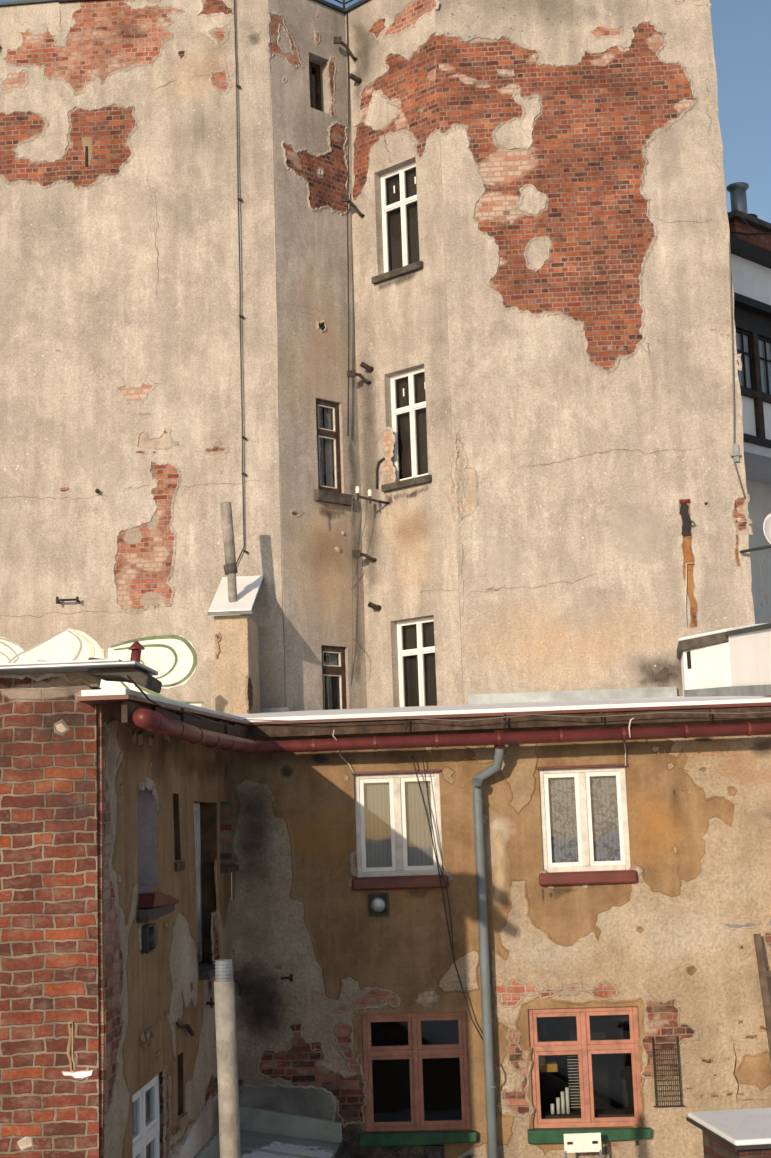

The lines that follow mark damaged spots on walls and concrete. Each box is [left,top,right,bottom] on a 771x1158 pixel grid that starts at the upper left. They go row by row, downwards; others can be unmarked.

spalling [0,0,234,190]
spalling [281,0,700,374]
spalling [110,380,183,613]
rust [682,536,697,628]
peeling [155,735,771,1158]